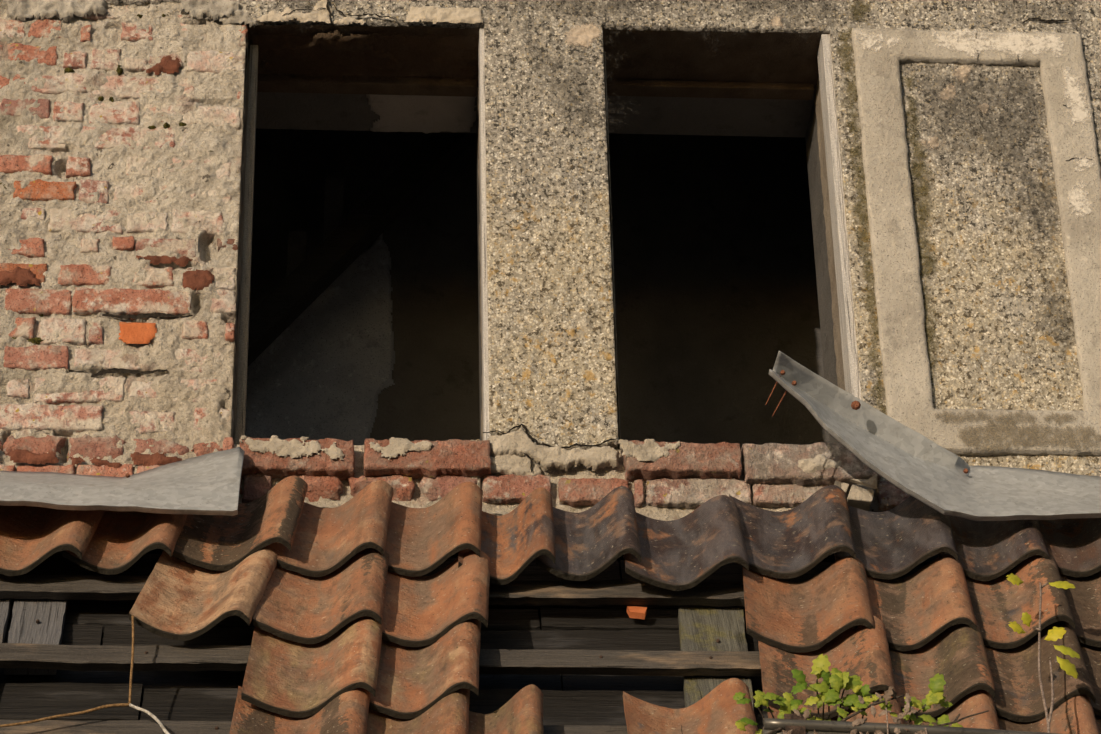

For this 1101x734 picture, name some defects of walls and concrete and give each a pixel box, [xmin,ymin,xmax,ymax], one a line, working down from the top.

flaking render [2,0,110,22]
flaking render [178,0,371,54]
spalling [146,55,181,75]
spalling [0,266,40,288]
spalling [136,255,214,290]
spalling [119,322,157,344]
spalling [9,449,182,468]
crack [483,424,618,472]